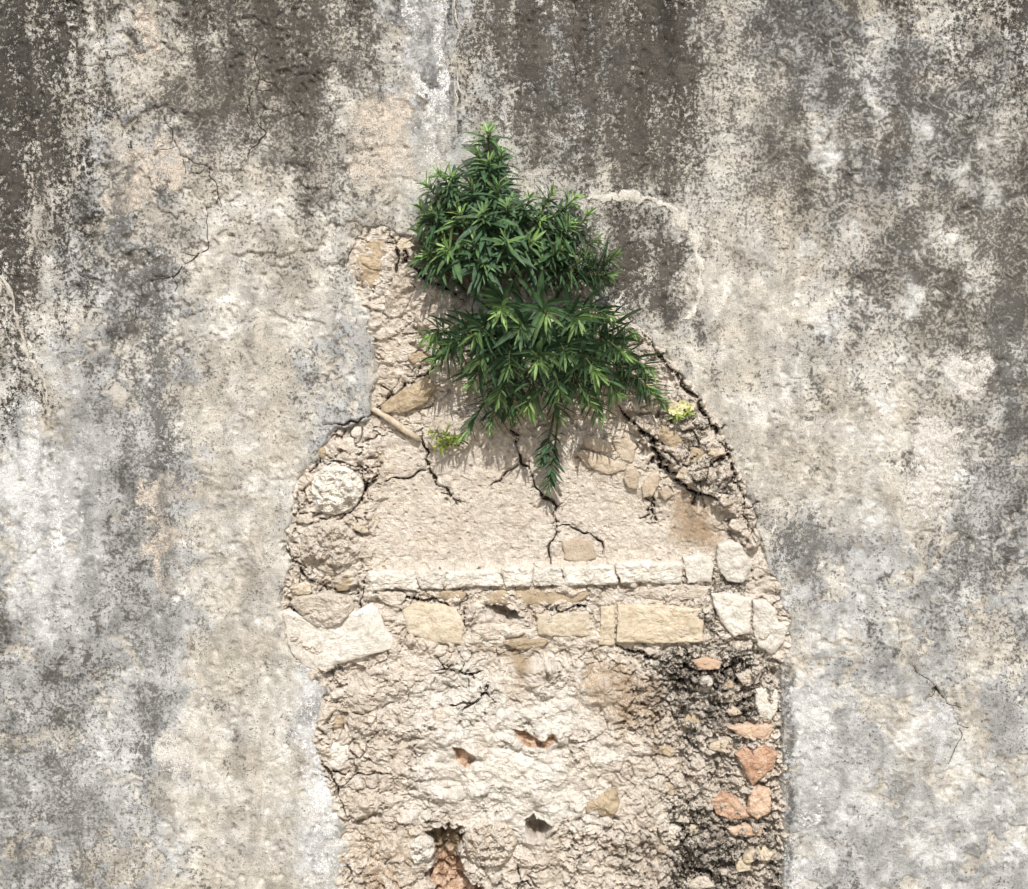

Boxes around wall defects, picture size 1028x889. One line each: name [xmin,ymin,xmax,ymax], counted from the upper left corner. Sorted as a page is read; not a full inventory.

water stain [877,0,1028,130]
water stain [145,0,805,334]
water stain [0,0,215,889]
flaking render [285,426,389,598]
crack [324,365,440,426]
crack [310,433,461,522]
crack [491,424,604,563]
flaking render [349,209,761,552]
crack [620,332,759,526]
spalling [422,822,495,889]
spalling [646,649,789,889]
water stain [633,564,835,889]